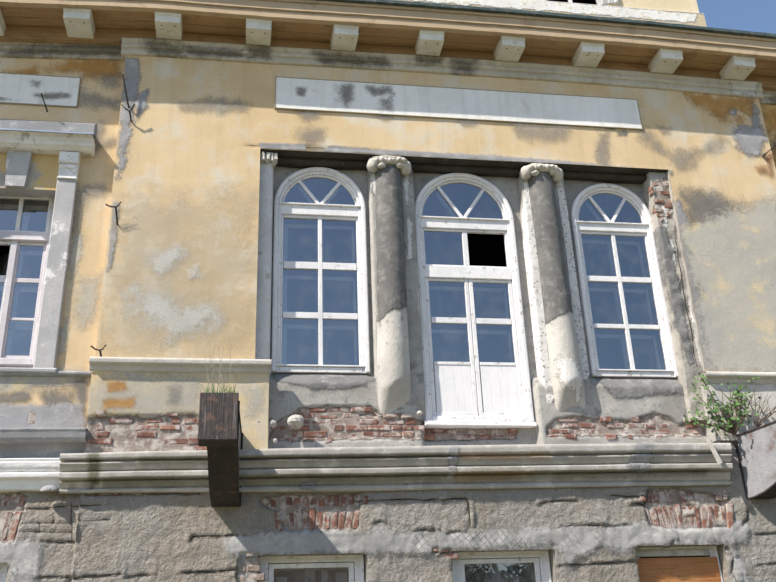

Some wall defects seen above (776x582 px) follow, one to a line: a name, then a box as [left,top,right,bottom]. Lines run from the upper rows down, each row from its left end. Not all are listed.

spalling [259,142,306,150]
spalling [323,145,625,167]
damp [678,188,743,223]
flaking render [648,169,776,372]
peeling [521,180,590,403]
flaking render [84,376,207,453]
flaking render [268,405,518,443]
flaking render [546,413,705,440]
crack [23,504,110,543]
flaking render [639,488,733,530]
crack [43,573,151,581]
crack [184,567,237,575]